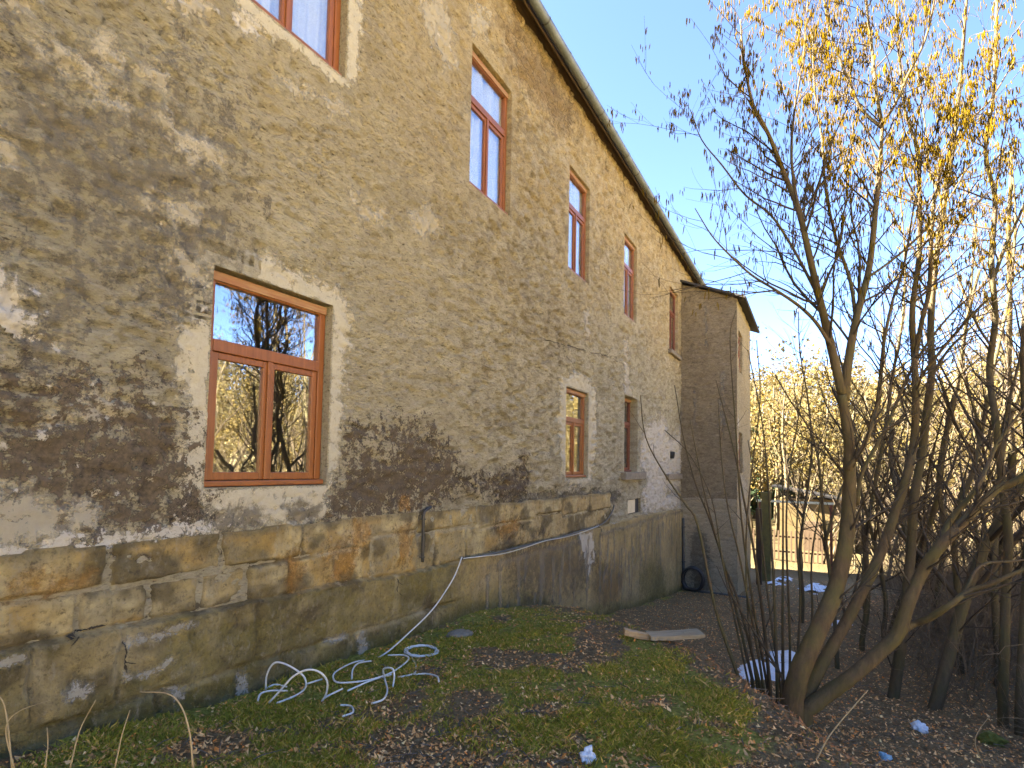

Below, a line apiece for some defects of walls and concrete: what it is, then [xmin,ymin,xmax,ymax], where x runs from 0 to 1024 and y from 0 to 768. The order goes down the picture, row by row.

leakage [0,0,272,564]
leakage [307,403,533,523]
crack [66,625,136,674]